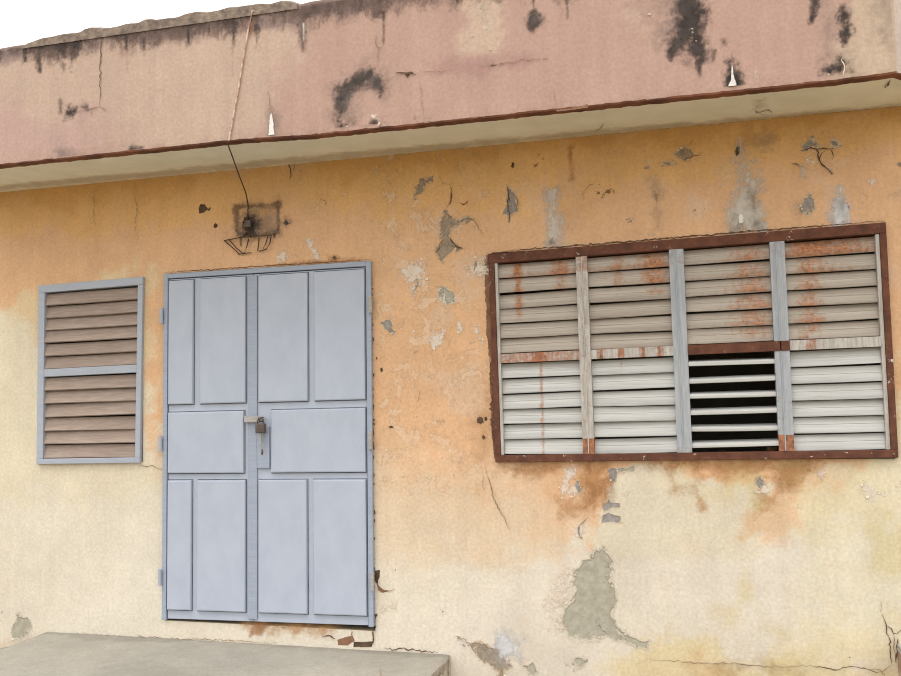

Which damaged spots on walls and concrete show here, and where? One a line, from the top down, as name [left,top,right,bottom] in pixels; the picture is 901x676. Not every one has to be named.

damp [10,38,94,72]
damp [113,15,260,49]
damp [334,69,383,127]
damp [667,0,725,72]
damp [726,53,743,87]
peeling [413,175,482,264]
peeling [502,183,519,223]
spalling [456,255,495,458]
peeling [541,544,651,651]
crack [380,648,449,676]
peeling [456,630,539,676]
crack [656,605,901,676]